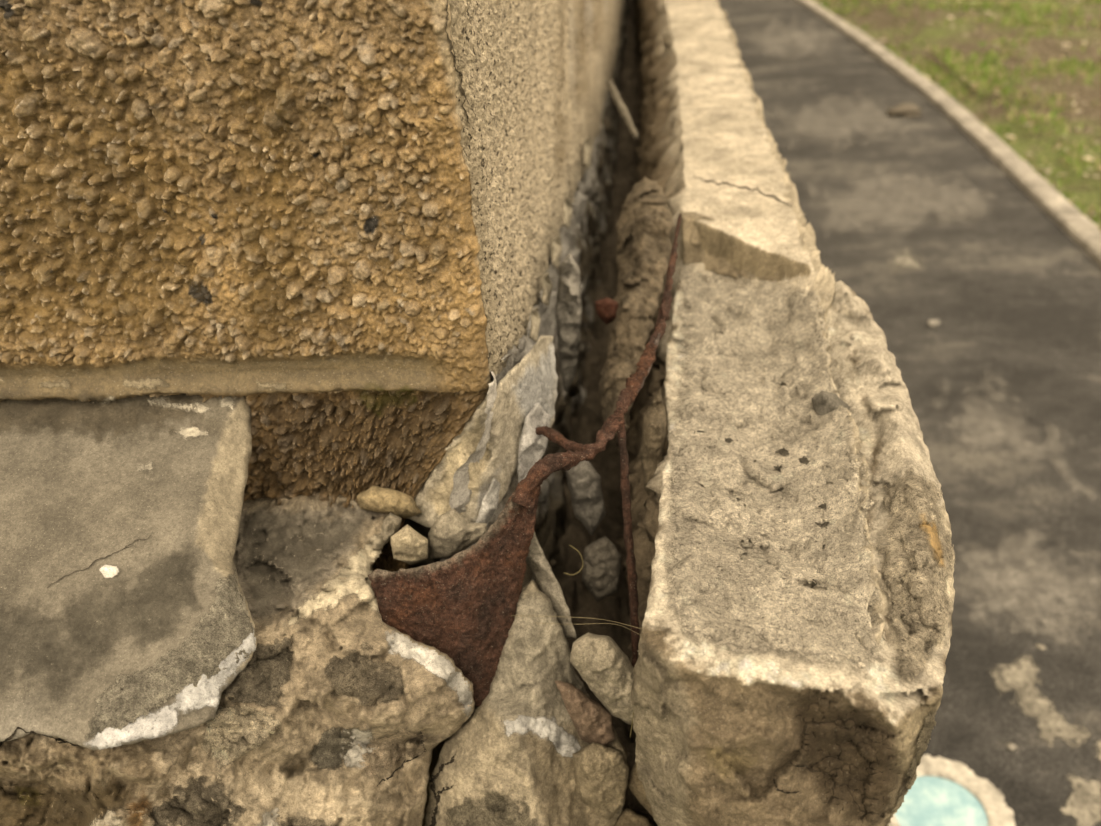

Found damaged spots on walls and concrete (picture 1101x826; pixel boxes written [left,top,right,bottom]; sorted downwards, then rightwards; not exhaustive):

crack [445,0,470,124]
crack [693,176,792,207]
peeling [408,196,573,528]
damp [0,555,195,695]
spalling [288,532,390,625]
spalling [360,729,426,775]
crack [378,731,456,826]
spalling [445,792,538,826]
crack [773,762,820,794]